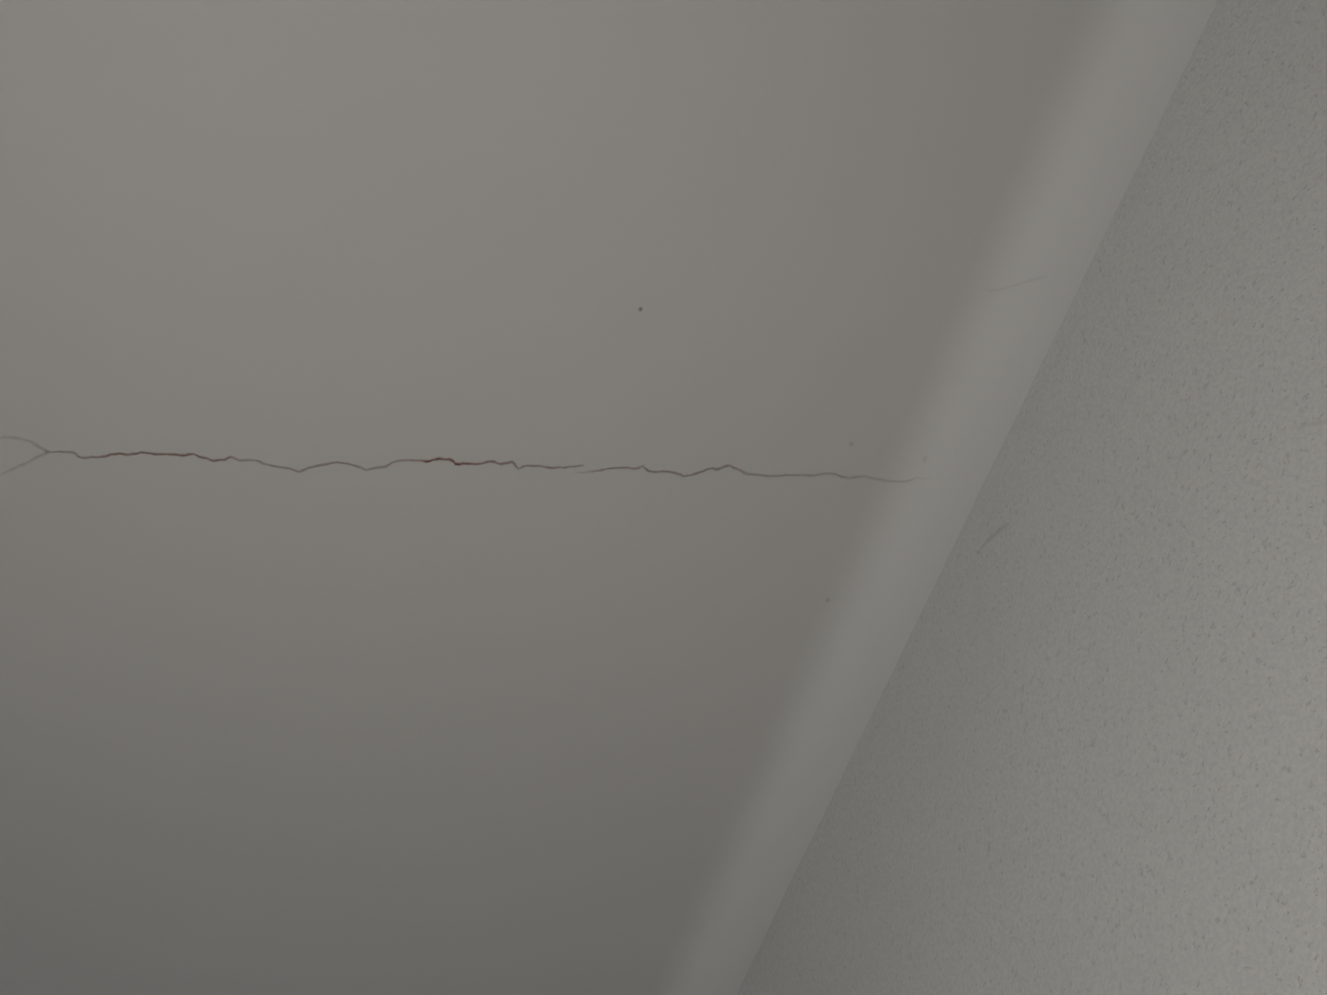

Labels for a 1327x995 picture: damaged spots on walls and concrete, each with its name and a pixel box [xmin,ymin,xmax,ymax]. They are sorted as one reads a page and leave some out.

crack [108,452,226,461]
crack [424,457,494,465]